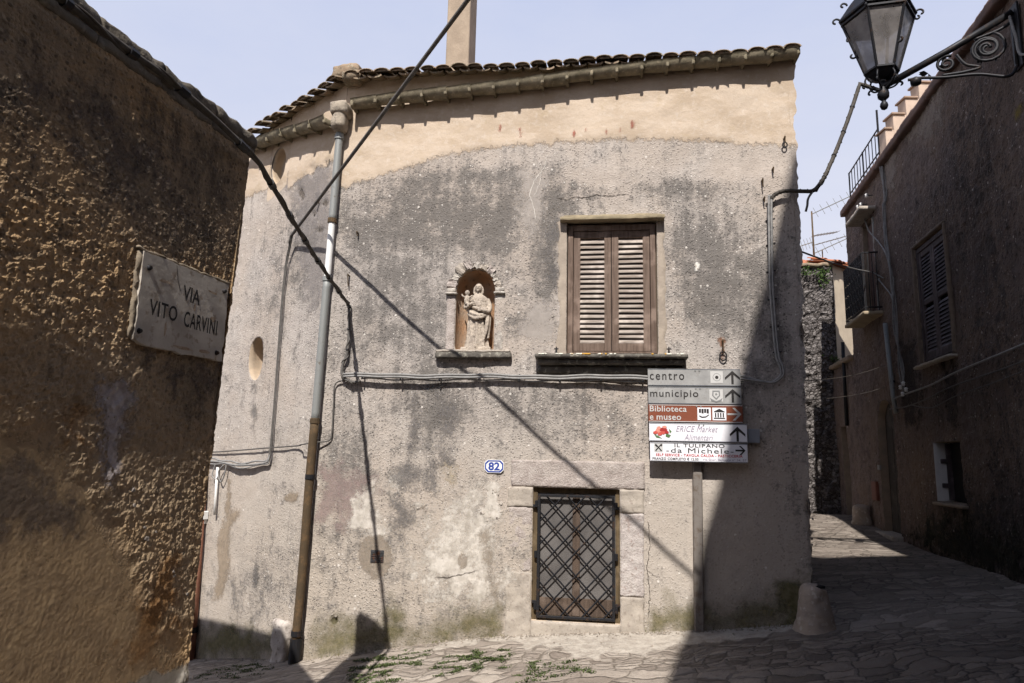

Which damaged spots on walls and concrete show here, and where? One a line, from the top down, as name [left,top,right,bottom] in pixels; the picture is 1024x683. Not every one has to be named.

peeling [515,171,548,234]
crack [529,156,624,219]